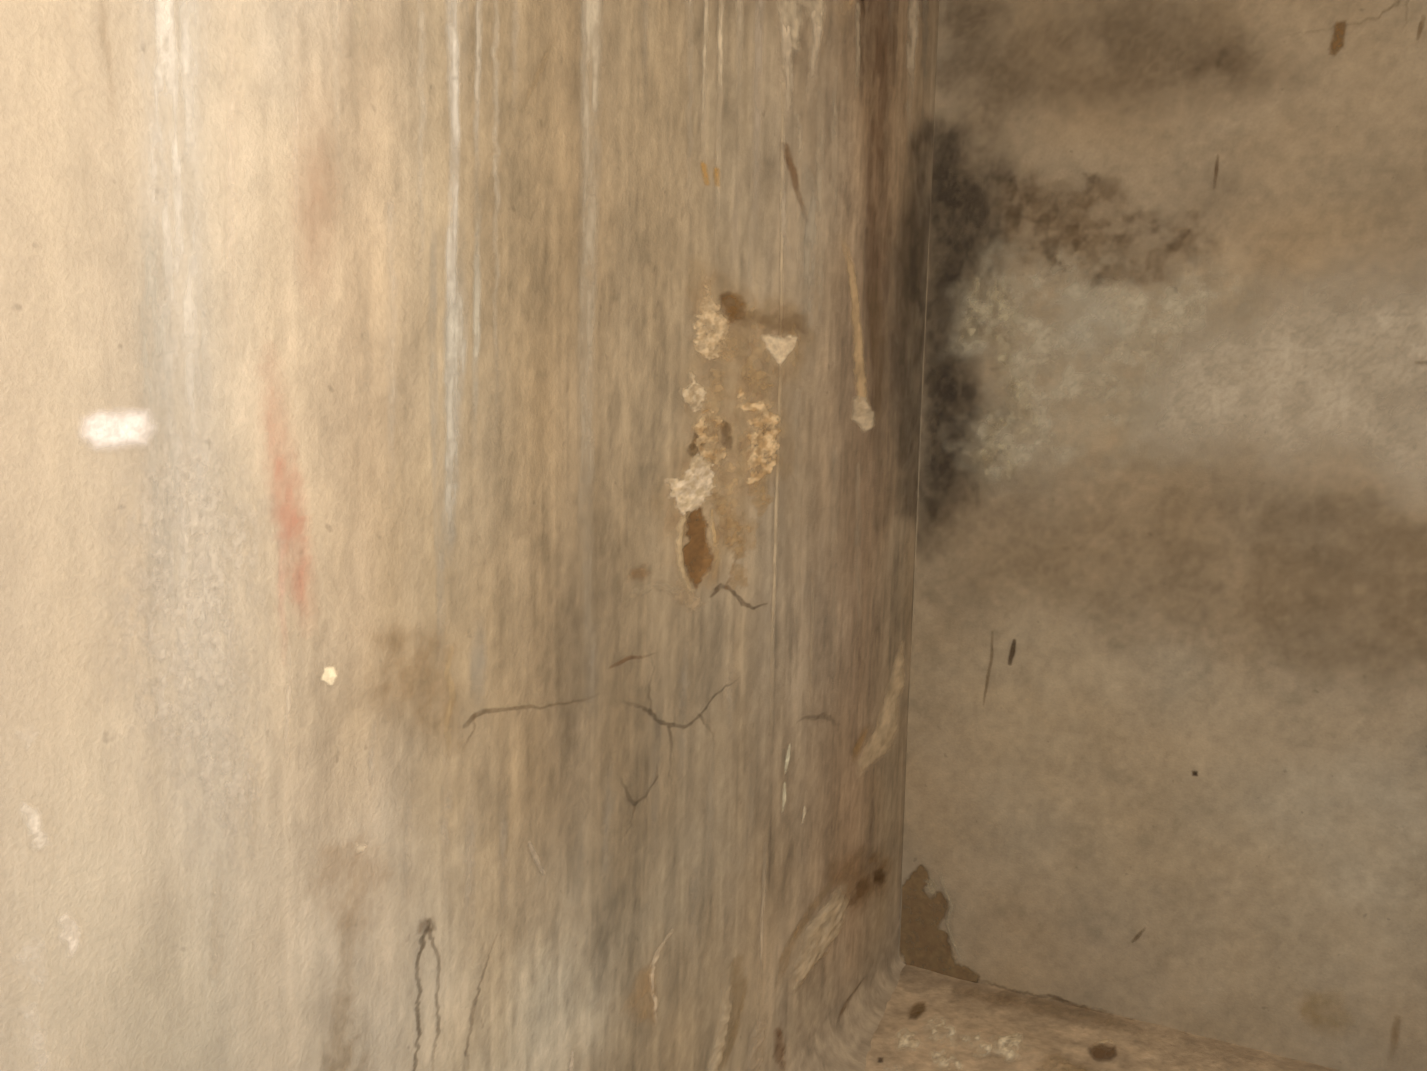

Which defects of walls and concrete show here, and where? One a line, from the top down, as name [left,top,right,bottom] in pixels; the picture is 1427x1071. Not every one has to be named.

water stain [155,0,191,174]
water stain [583,0,600,261]
water stain [689,0,763,107]
water stain [907,0,927,85]
water stain [445,186,480,515]
peeling [669,285,801,610]
water stain [772,363,782,612]
water stain [907,131,1427,521]
flaking render [900,865,979,983]